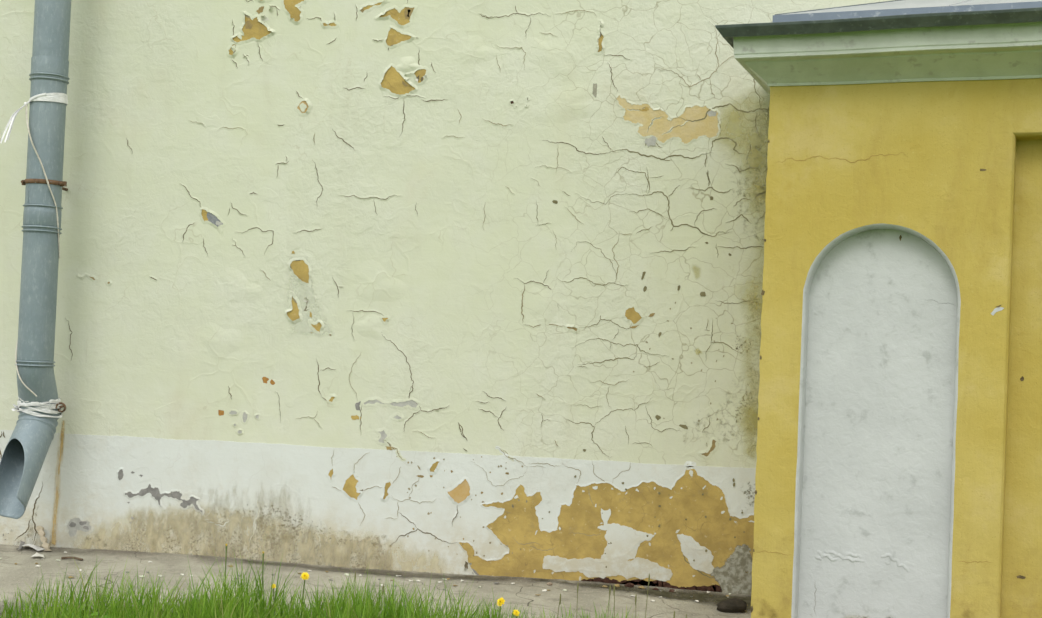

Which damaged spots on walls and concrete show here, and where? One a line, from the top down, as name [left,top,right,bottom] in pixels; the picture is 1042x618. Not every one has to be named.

peeling [225,0,340,69]
peeling [354,0,437,137]
crack [478,5,598,73]
peeling [594,19,721,147]
peeling [284,251,331,336]
crack [274,20,906,548]
spalling [116,467,205,516]
damp [126,505,507,580]
peeling [326,427,755,588]